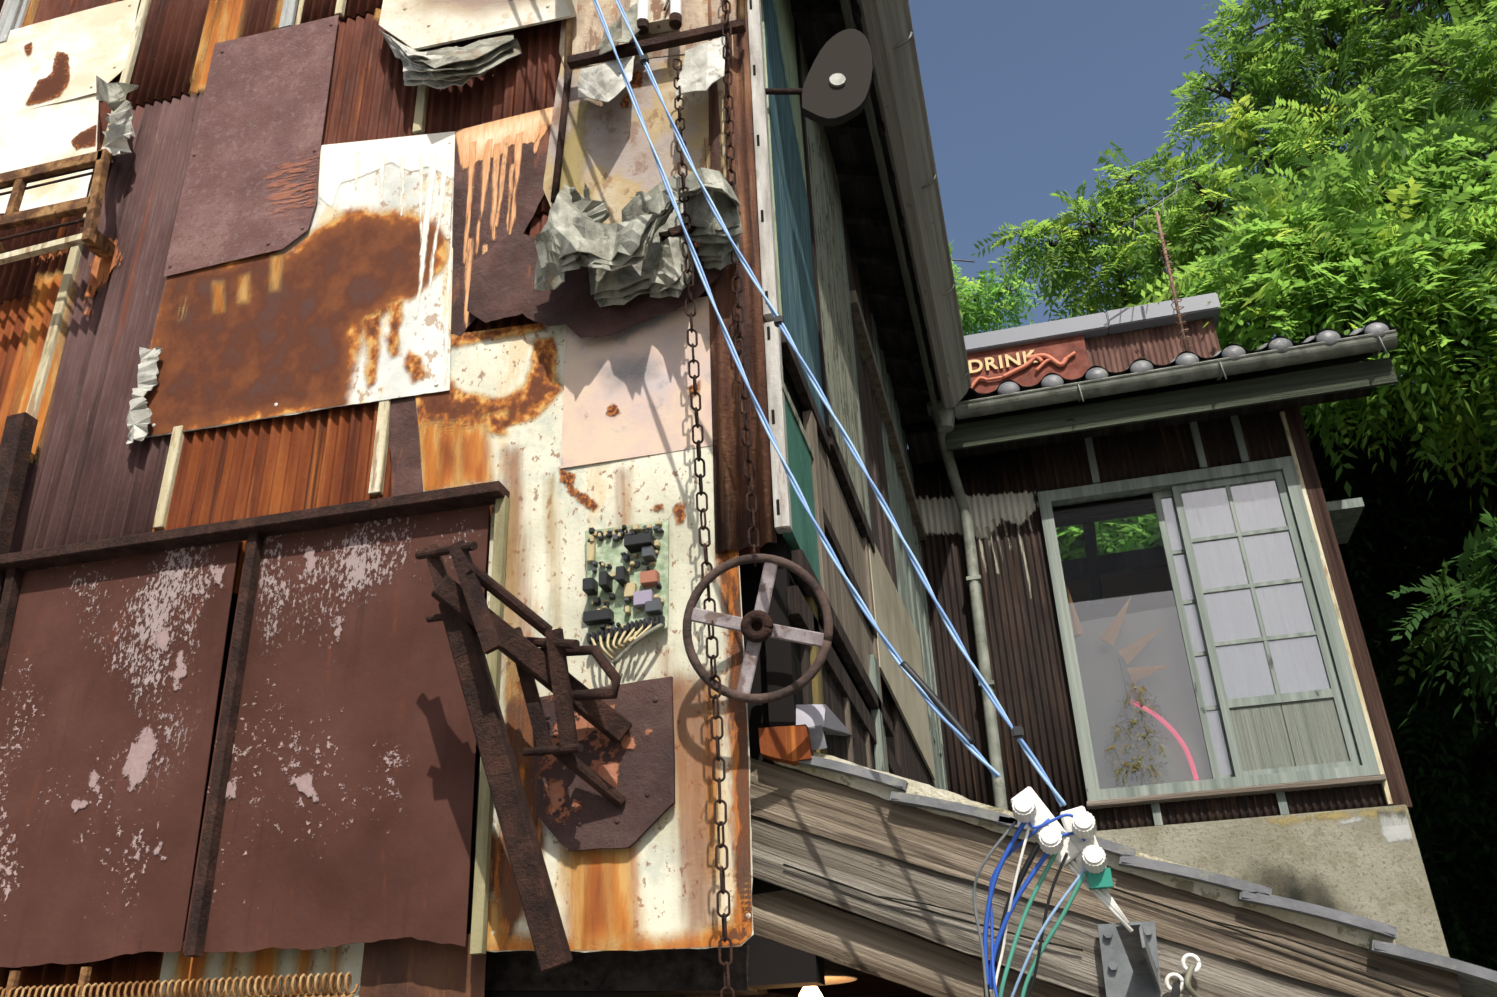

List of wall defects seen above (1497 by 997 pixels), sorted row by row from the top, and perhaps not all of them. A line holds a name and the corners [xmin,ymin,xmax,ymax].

rust [26,51,70,106]
rust [193,0,244,92]
rust [144,156,562,491]
peeling [256,511,474,649]
rust [559,469,598,511]
rust [653,502,685,524]
peeling [0,652,51,921]
peeling [37,544,226,926]
peeling [207,664,409,858]
rust [505,659,544,854]
rust [566,550,752,950]
rust [486,829,535,950]